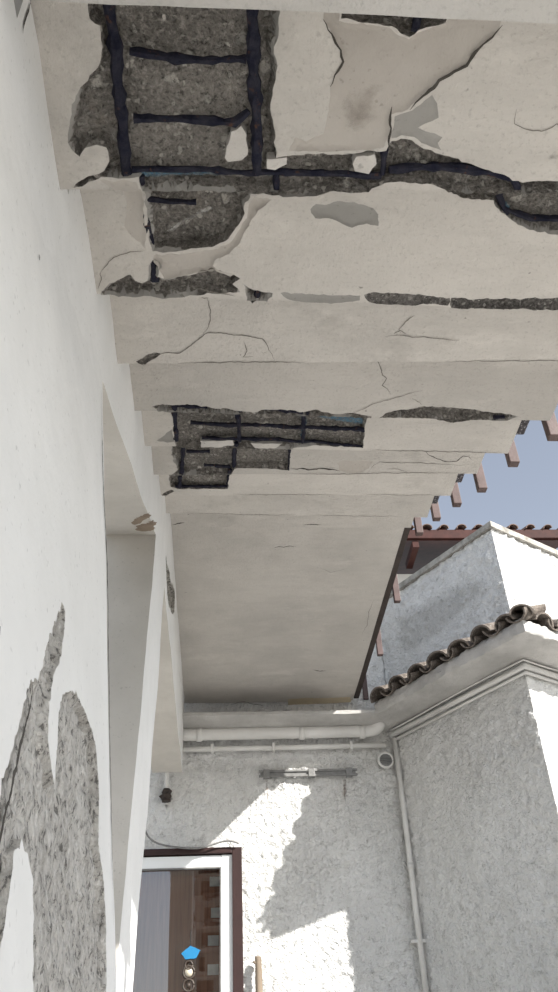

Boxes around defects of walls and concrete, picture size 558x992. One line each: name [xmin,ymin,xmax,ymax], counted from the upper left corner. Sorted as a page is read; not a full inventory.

spalling [68,3,558,304]
crack [514,109,558,132]
crack [137,287,275,361]
crack [386,315,456,341]
crack [352,362,422,414]
spalling [152,404,518,496]
peeling [131,513,157,531]
spalling [0,602,107,992]